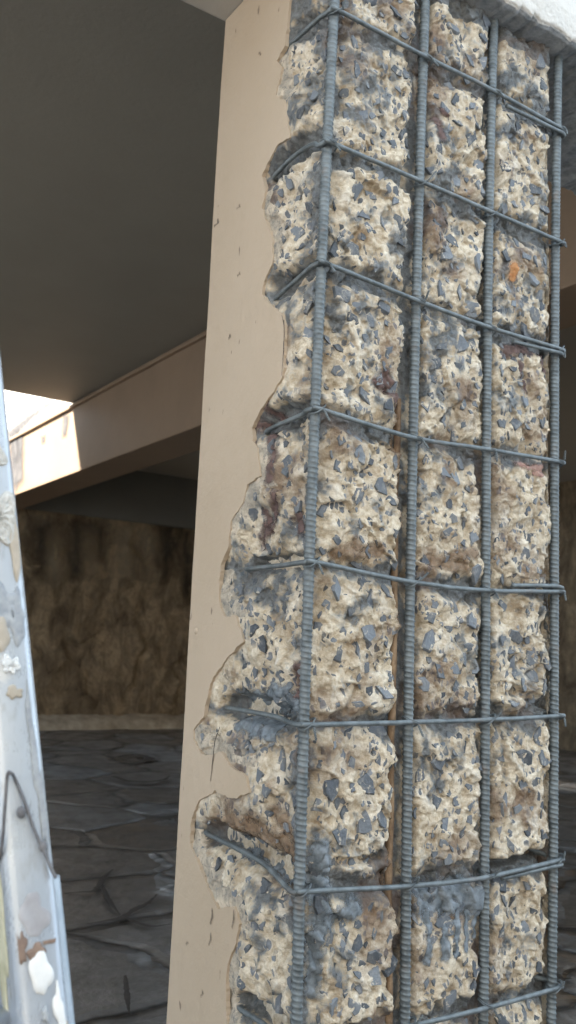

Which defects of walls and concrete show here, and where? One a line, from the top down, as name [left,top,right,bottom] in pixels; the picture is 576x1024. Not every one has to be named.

rust [509,262,519,281]
rust [255,400,305,550]
spalling [193,0,576,1024]